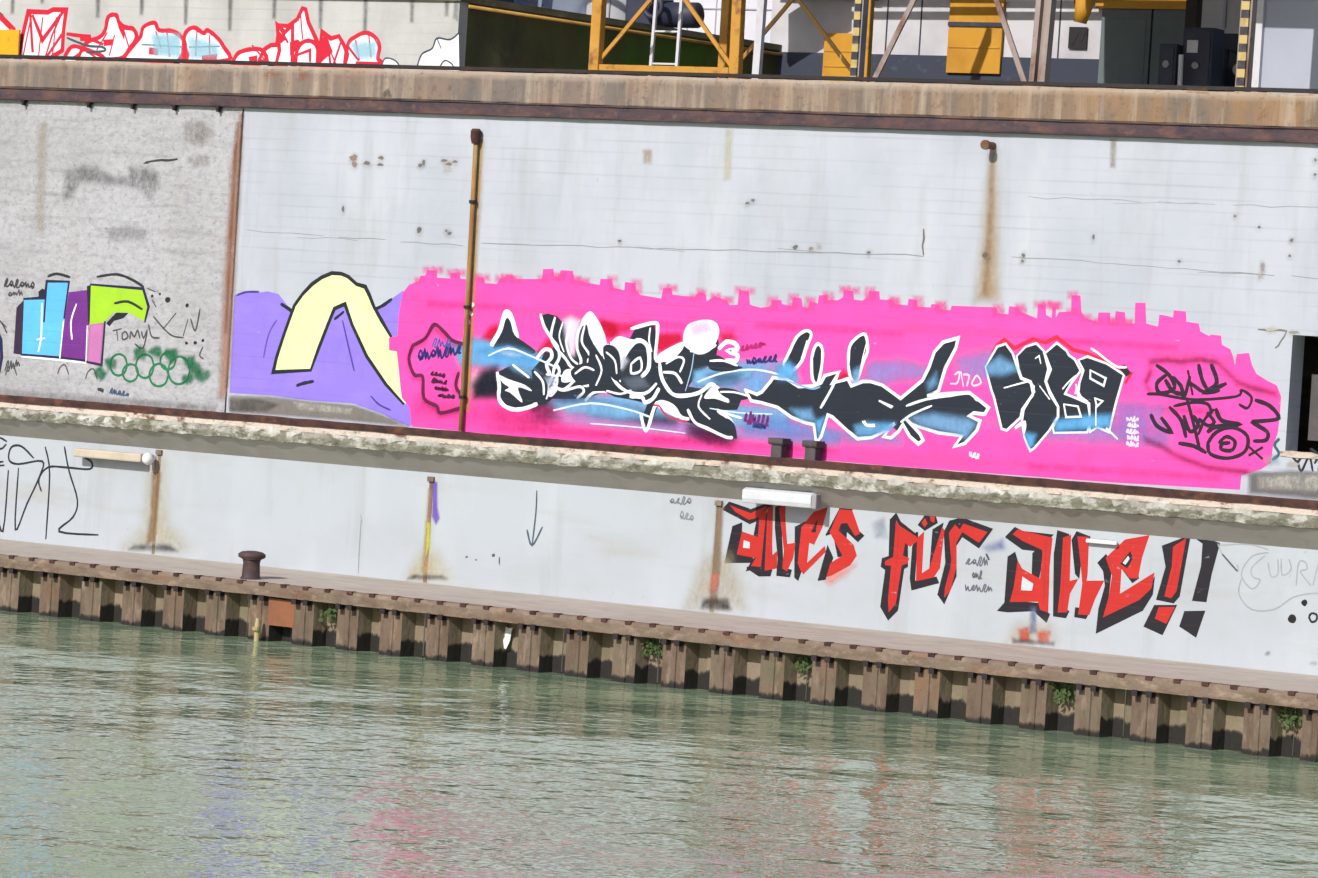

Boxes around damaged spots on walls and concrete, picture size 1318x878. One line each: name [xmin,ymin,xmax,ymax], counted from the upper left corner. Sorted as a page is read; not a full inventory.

corrosion [464,140,482,411]